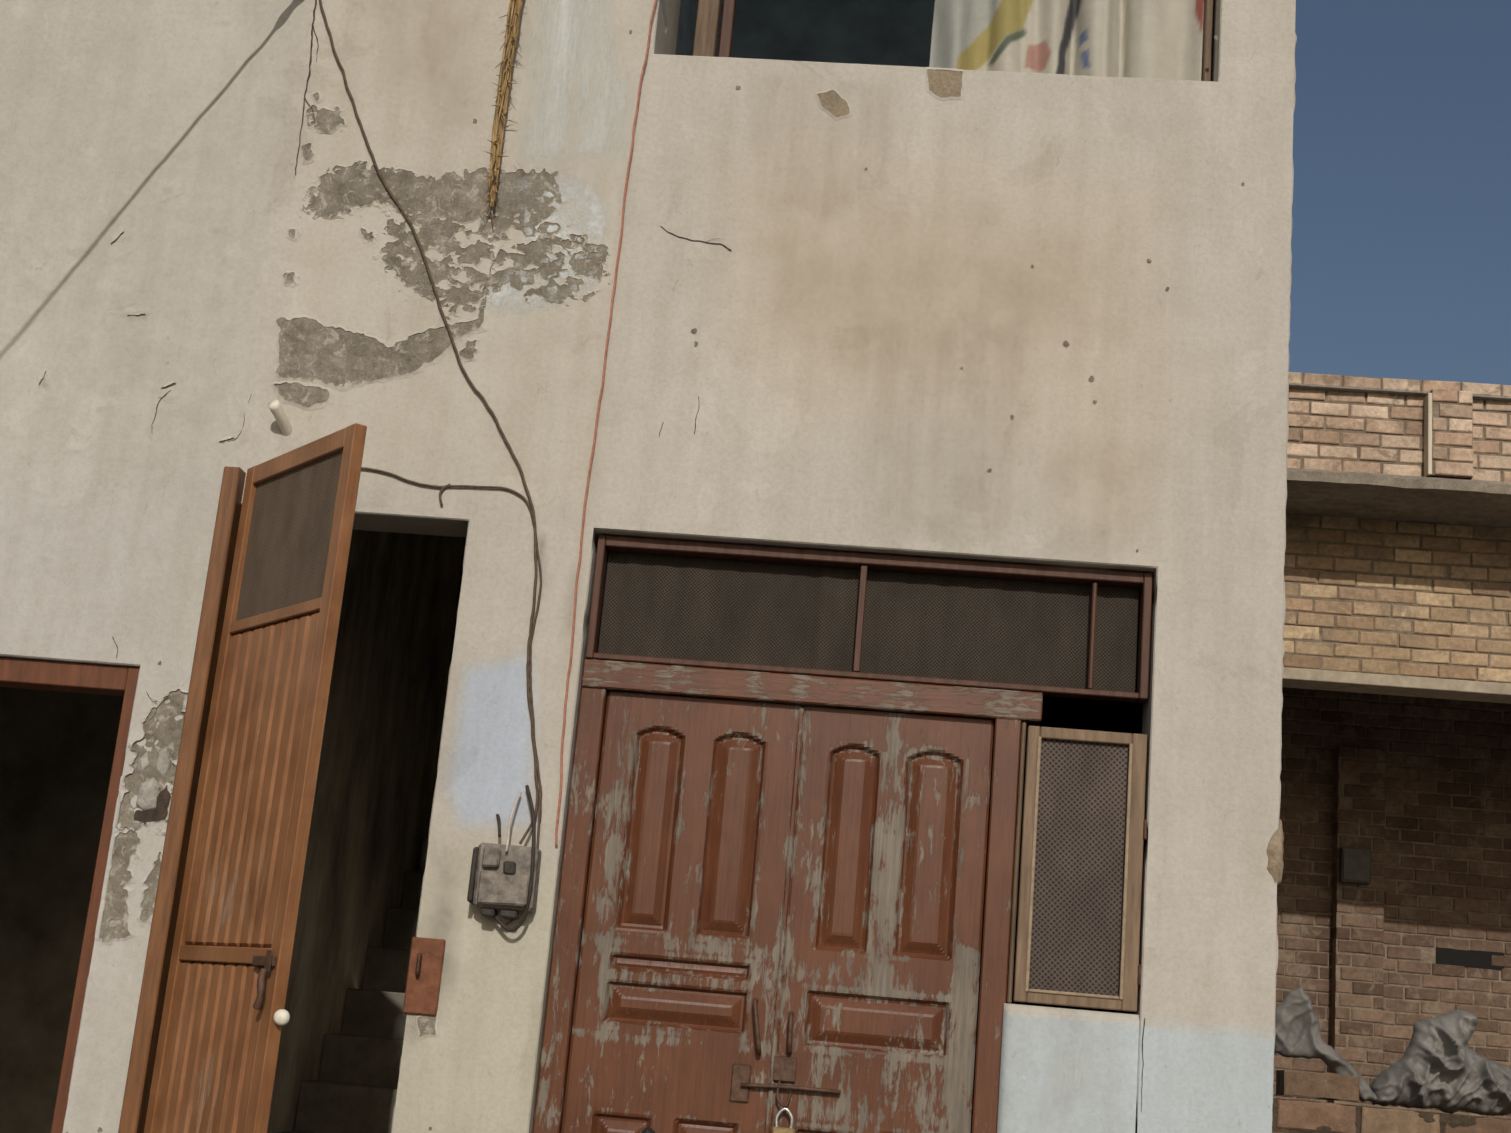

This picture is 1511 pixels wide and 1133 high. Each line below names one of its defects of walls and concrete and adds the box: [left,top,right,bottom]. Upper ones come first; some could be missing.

spalling [815,88,853,120]
spalling [925,67,966,100]
flaking render [271,90,612,410]
spalling [95,682,188,945]